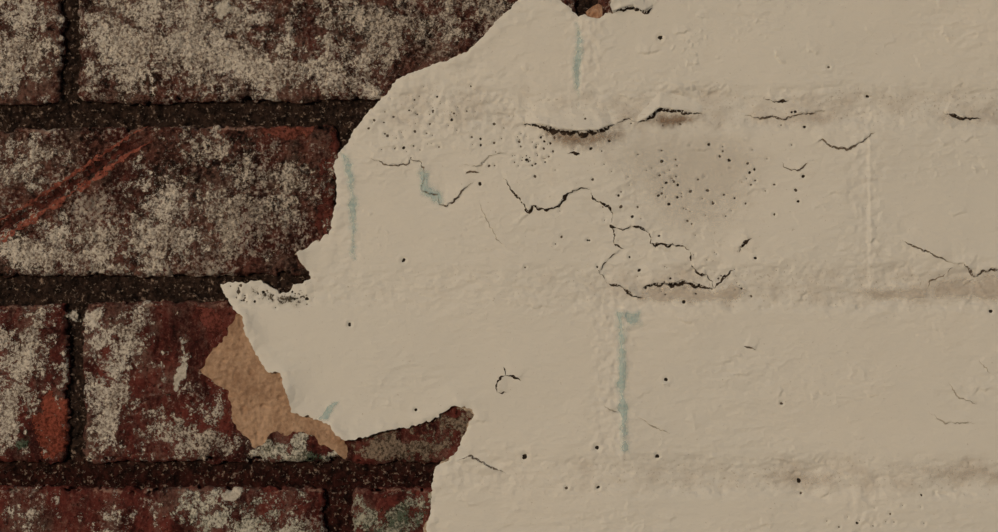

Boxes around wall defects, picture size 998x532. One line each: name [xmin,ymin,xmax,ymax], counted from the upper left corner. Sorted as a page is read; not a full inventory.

leakage [77,0,512,103]
leakage [0,125,353,277]
spalling [314,129,339,234]
crack [371,153,507,248]
peeling [512,92,703,178]
crack [505,179,750,298]
crack [906,242,998,286]
leakage [0,304,69,457]
spalling [32,390,69,461]
leakage [83,300,337,463]
peeling [200,314,348,460]
leakage [1,486,327,532]